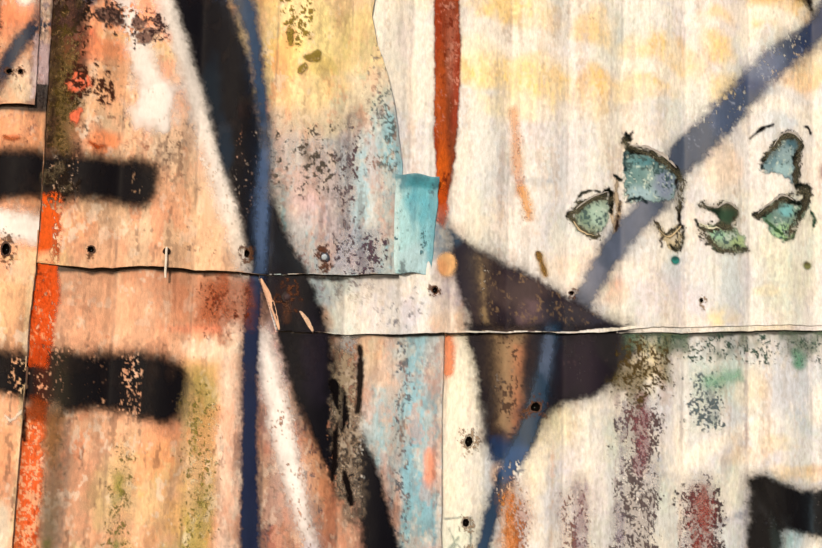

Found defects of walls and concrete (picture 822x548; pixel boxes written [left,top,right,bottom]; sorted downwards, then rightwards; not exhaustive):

corrosion [45,0,104,155]
peeling [565,132,687,264]
peeling [694,200,750,255]
peeling [752,125,817,242]
corrosion [201,284,251,322]